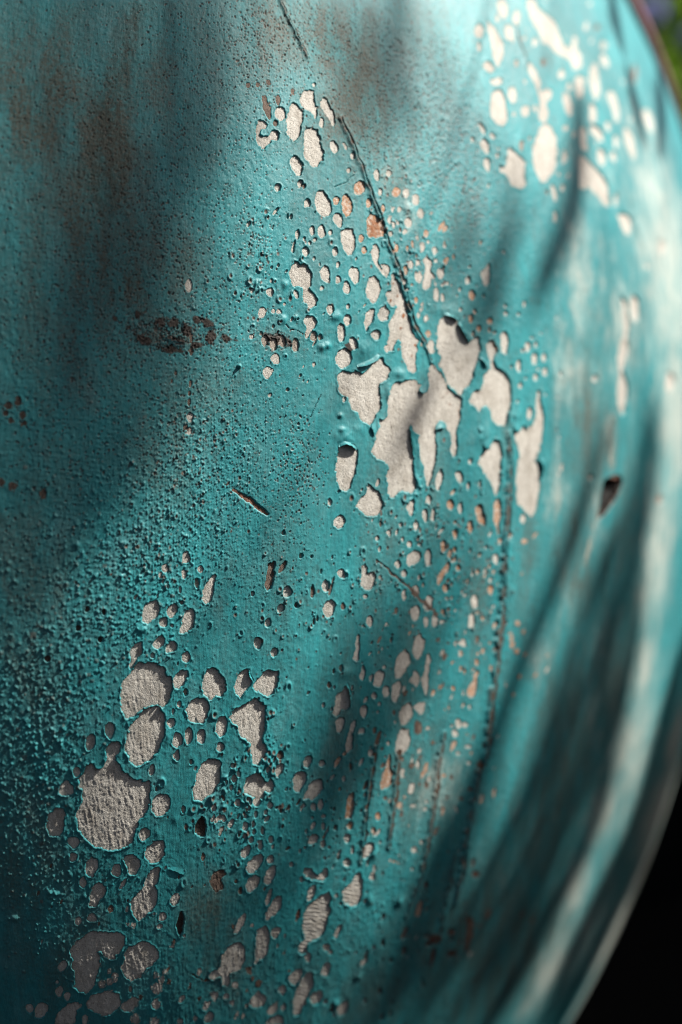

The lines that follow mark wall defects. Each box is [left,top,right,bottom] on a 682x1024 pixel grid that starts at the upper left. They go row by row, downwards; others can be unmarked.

crack [335,127,438,373]
peeling [1,395,27,428]
peeling [25,80,563,1024]